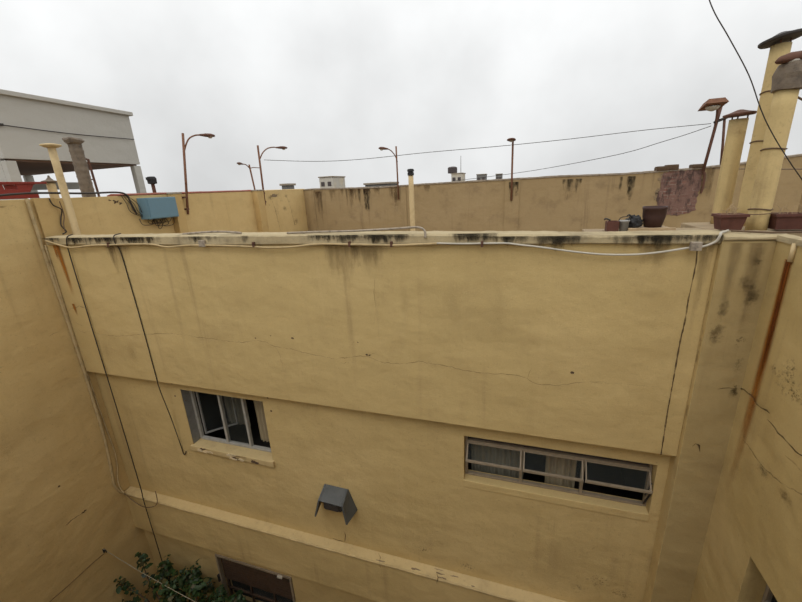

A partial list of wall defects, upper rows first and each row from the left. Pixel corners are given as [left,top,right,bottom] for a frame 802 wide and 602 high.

rust [53,245,70,282]
water stain [538,236,579,245]
crack [660,251,698,455]
rust [747,259,791,422]
crack [720,388,802,456]